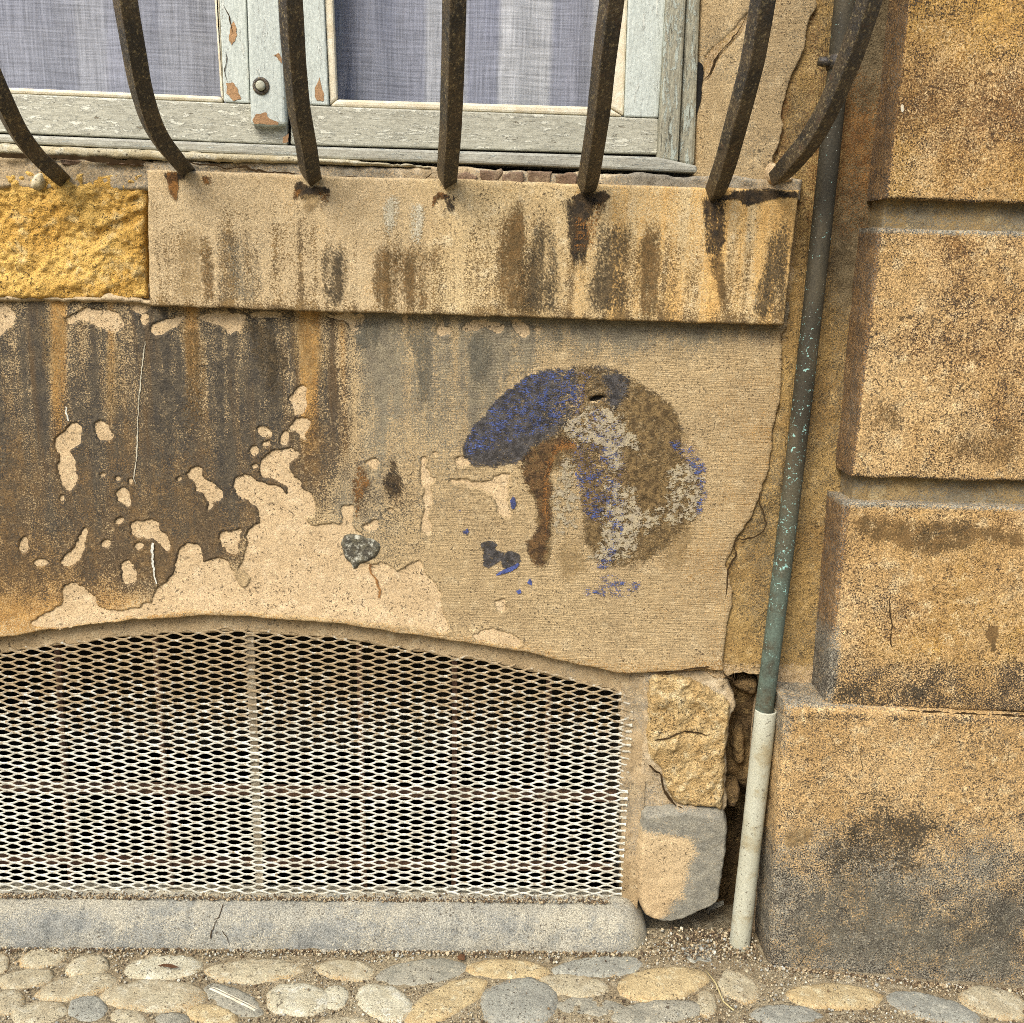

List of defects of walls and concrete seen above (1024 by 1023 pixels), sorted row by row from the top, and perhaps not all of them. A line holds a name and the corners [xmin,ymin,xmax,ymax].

crack [705,13,747,79]
rust [164,171,185,200]
rust [293,181,330,207]
rust [562,190,611,271]
rust [702,188,798,311]
peeling [66,307,124,331]
peeling [129,303,282,336]
peeling [19,527,88,567]
peeling [32,385,449,632]
crack [725,491,767,599]
crack [648,731,707,810]
water stain [790,788,1019,978]